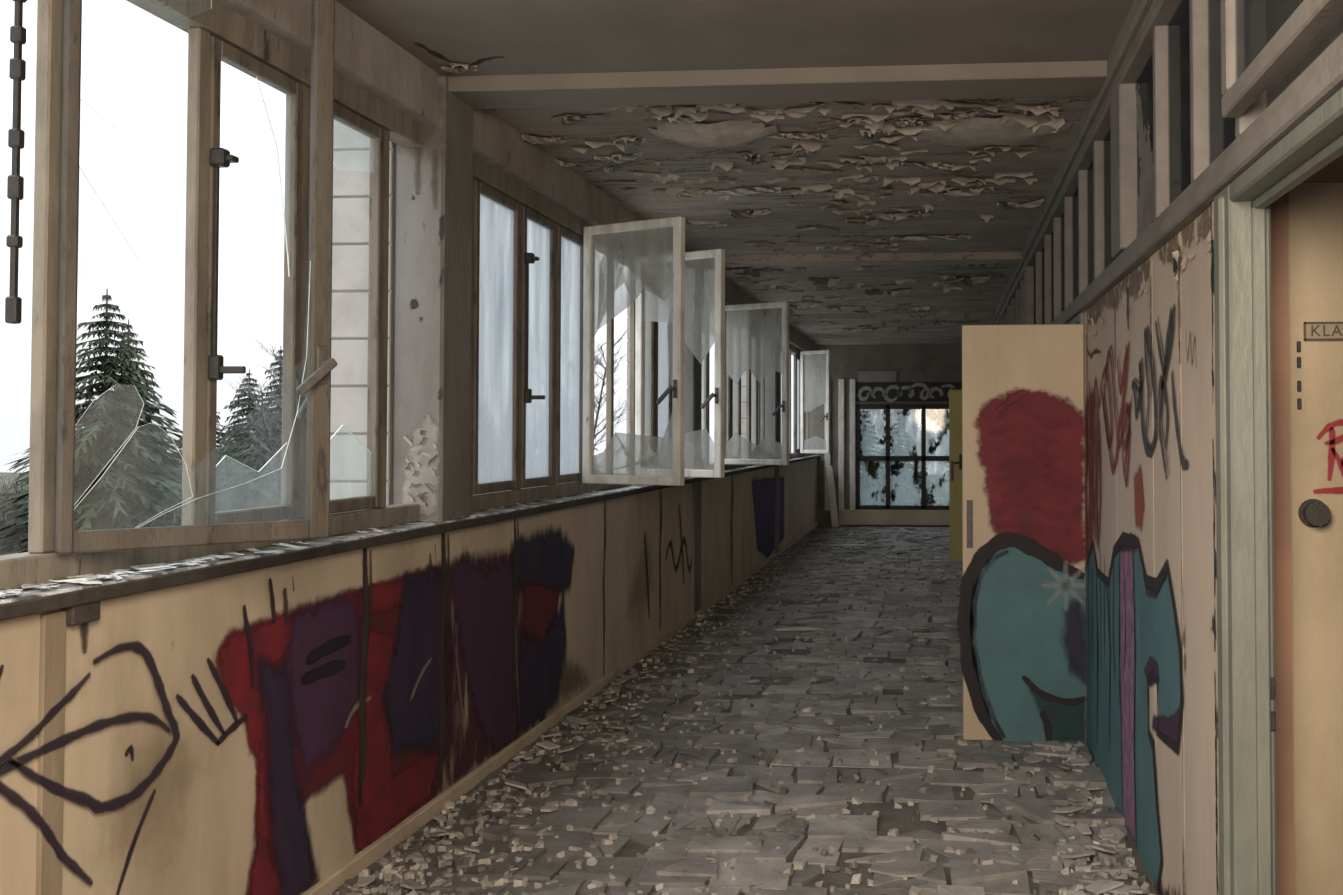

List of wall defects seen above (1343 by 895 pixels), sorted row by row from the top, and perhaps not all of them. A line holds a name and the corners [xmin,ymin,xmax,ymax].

peeling [521,99,1065,333]
peeling [401,413,440,516]